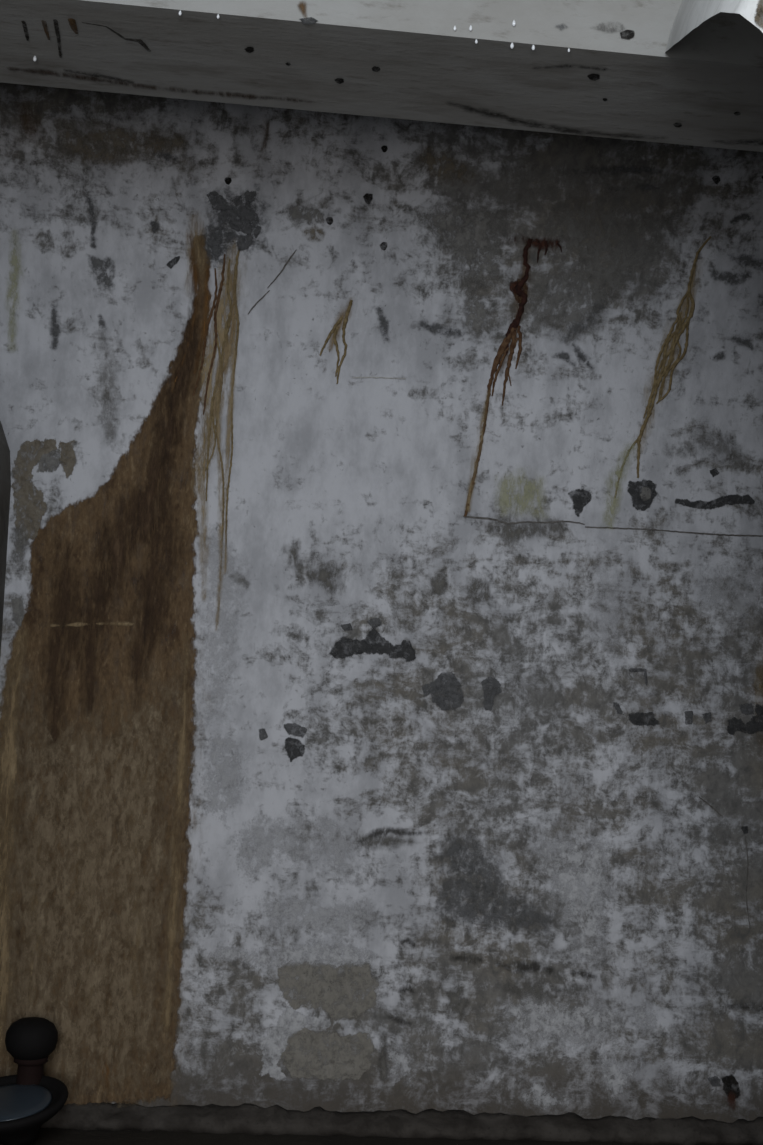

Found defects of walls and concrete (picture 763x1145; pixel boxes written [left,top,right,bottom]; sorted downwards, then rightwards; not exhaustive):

spalling [754,0,763,28]
spalling [205,178,265,263]
corrosion [464,237,562,517]
damp [289,544,337,592]
spalling [330,618,416,661]